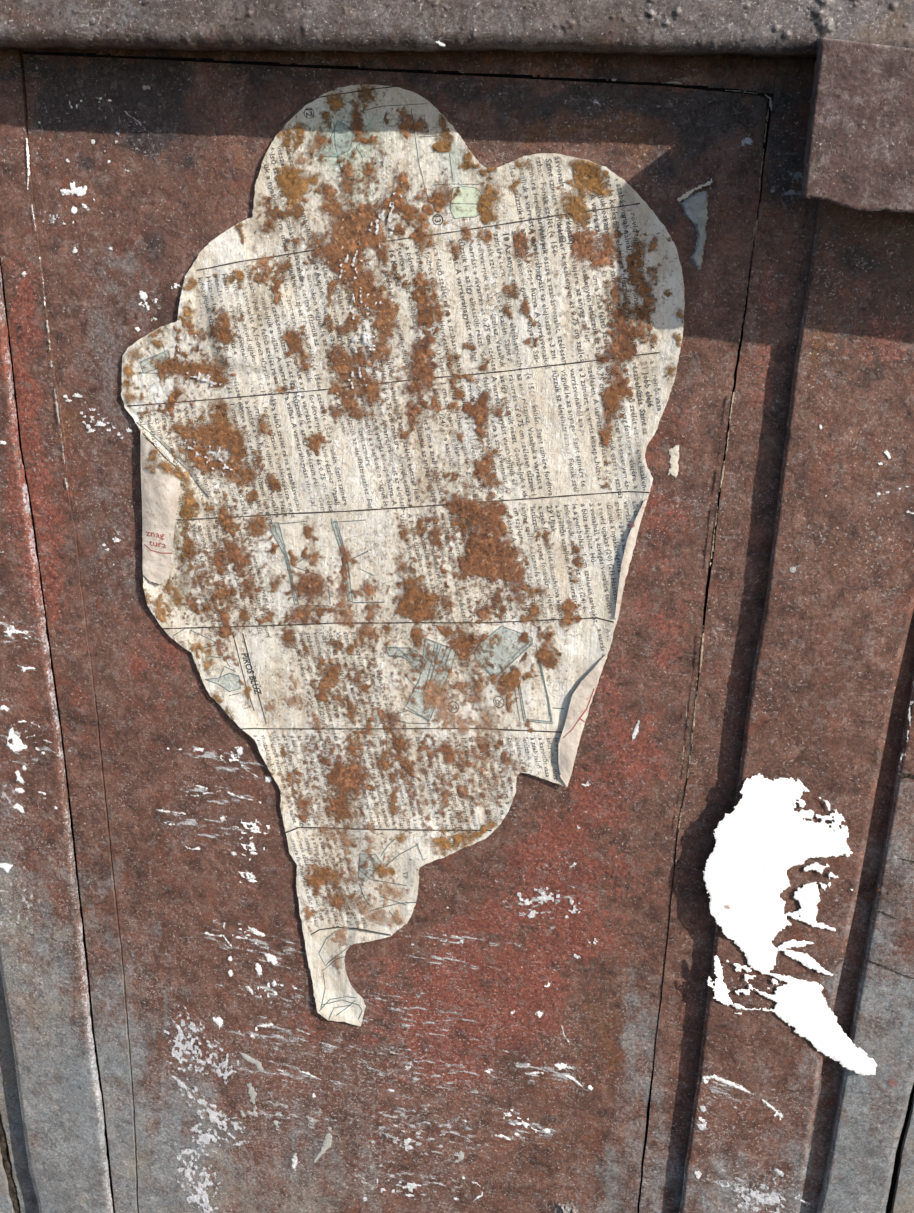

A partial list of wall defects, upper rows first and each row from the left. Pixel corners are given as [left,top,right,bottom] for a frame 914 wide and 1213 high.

crack [759,100,772,204]
corrosion [557,159,672,447]
corrosion [673,309,684,347]
crack [696,245,754,699]
corrosion [123,85,584,974]
crack [897,772,914,780]
crack [867,960,914,979]
crack [637,886,673,1213]
crack [0,1112,20,1213]
corrosion [552,1195,583,1213]
crack [888,1099,913,1213]